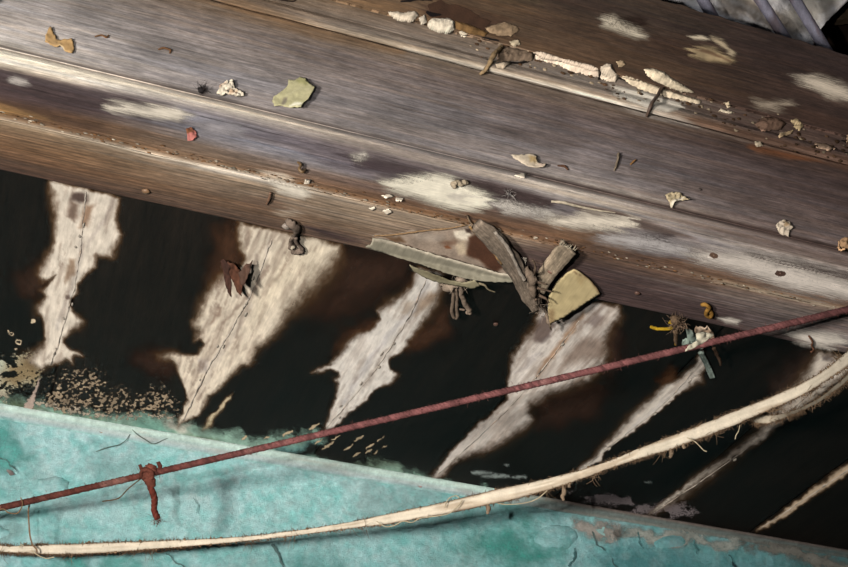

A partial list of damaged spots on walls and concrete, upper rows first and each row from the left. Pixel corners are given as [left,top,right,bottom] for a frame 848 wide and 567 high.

spalling [388,0,848,163]
water stain [343,156,418,176]
water stain [460,179,551,209]
water stain [748,253,848,280]
water stain [0,181,451,449]
water stain [432,302,622,478]
water stain [569,352,848,519]
water stain [758,464,848,530]
water stain [53,554,87,567]